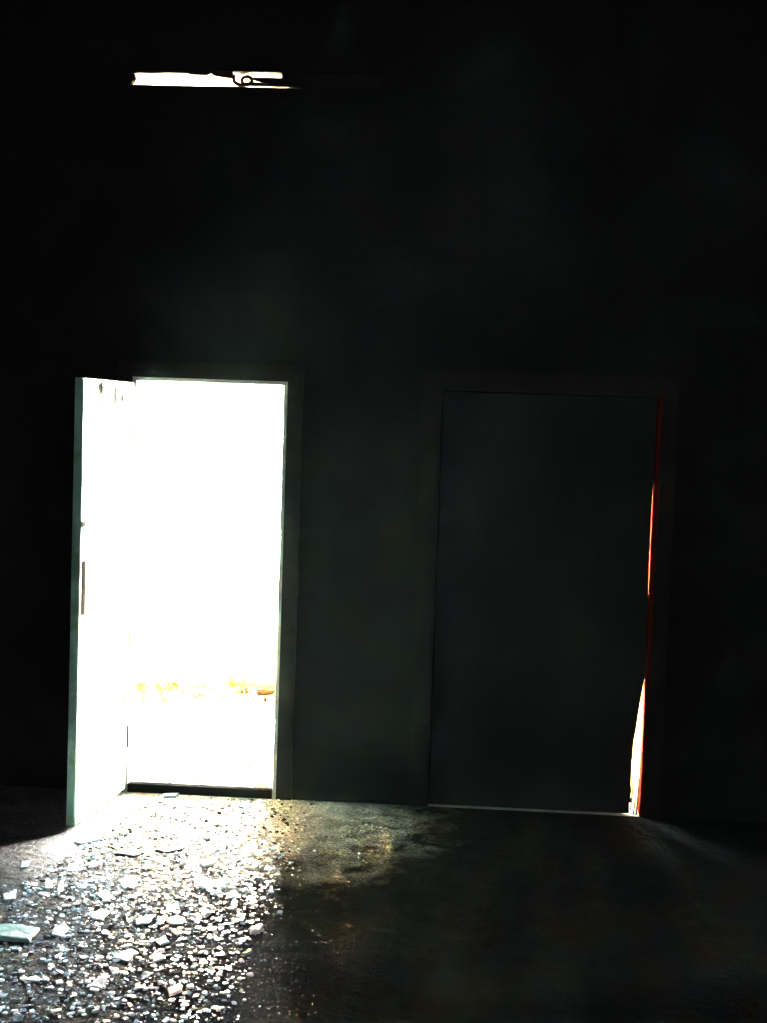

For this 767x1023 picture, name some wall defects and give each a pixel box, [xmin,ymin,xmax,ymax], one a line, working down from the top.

spalling [139,381,241,472]
spalling [228,567,279,688]